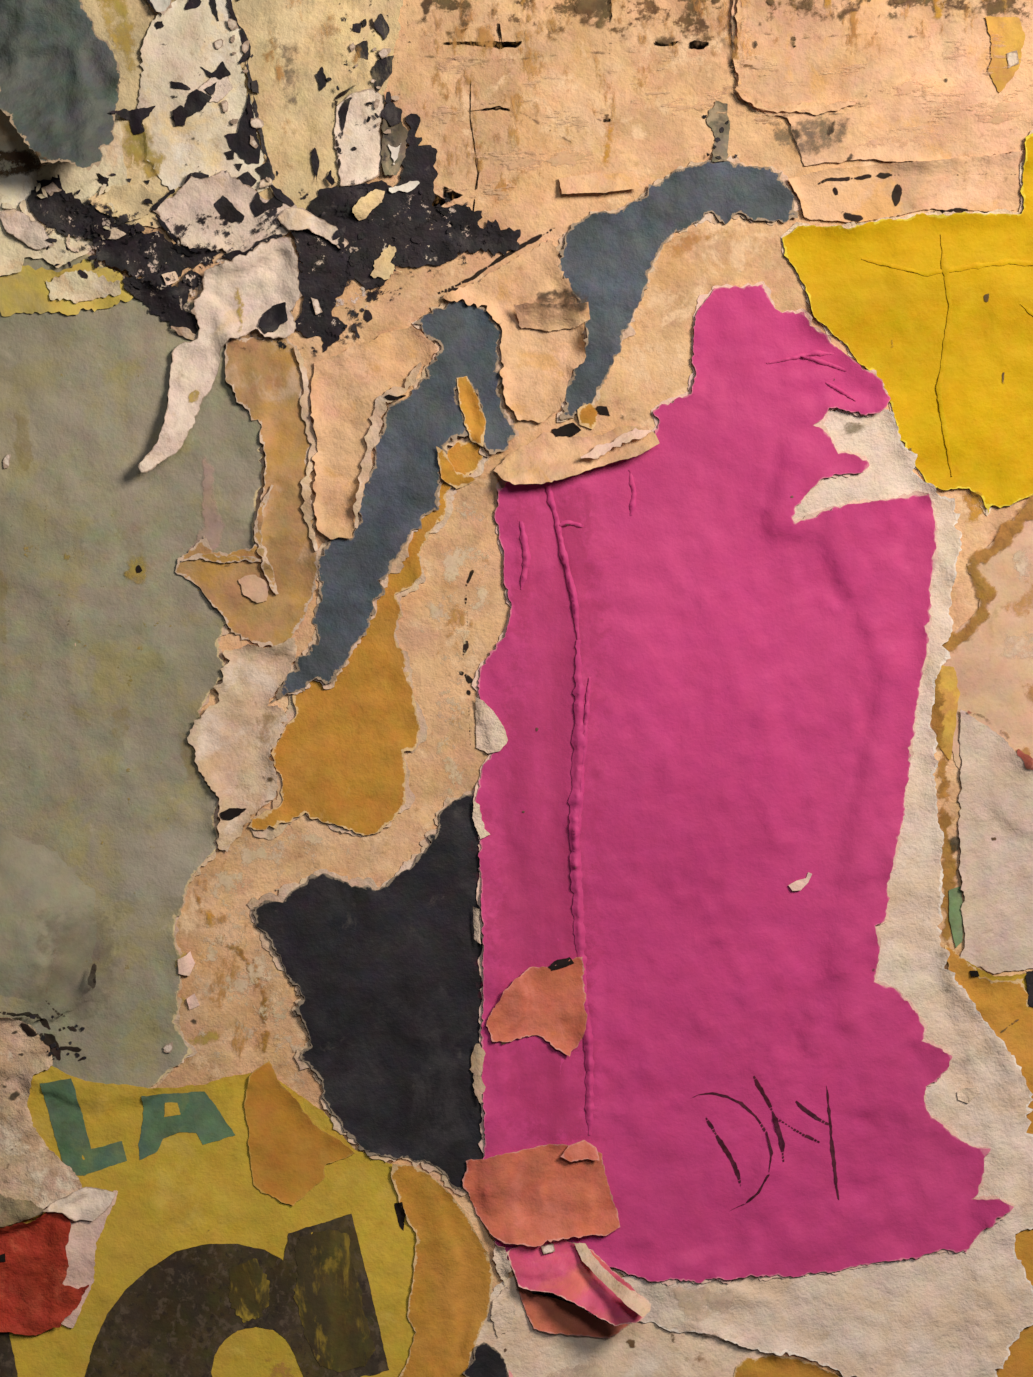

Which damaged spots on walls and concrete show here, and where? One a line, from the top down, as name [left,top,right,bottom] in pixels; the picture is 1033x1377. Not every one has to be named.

peeling [0,3,521,356]
water stain [420,0,1033,216]
peeling [788,872,812,891]